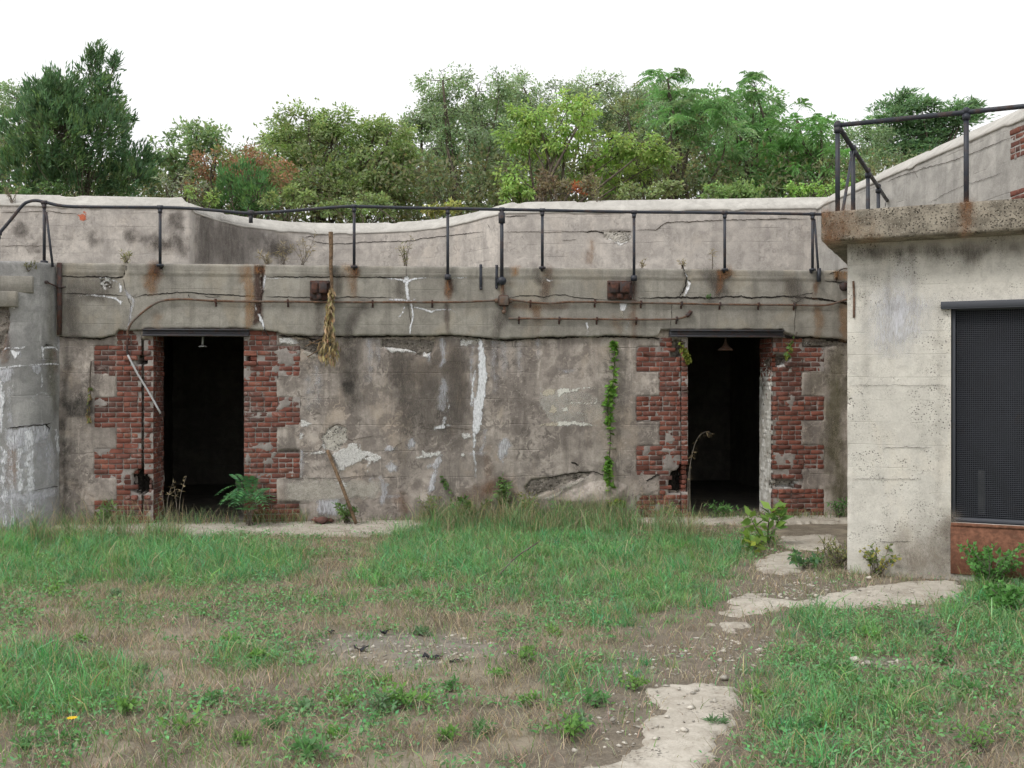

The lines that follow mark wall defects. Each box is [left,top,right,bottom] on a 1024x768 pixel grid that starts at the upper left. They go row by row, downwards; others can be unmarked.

crack [303,215,800,244]
rust [246,266,265,325]
damp [389,276,451,334]
damp [393,339,488,462]
spalling [134,469,153,494]
flaking render [287,425,396,515]
spalling [524,472,590,500]
spalling [668,464,689,493]